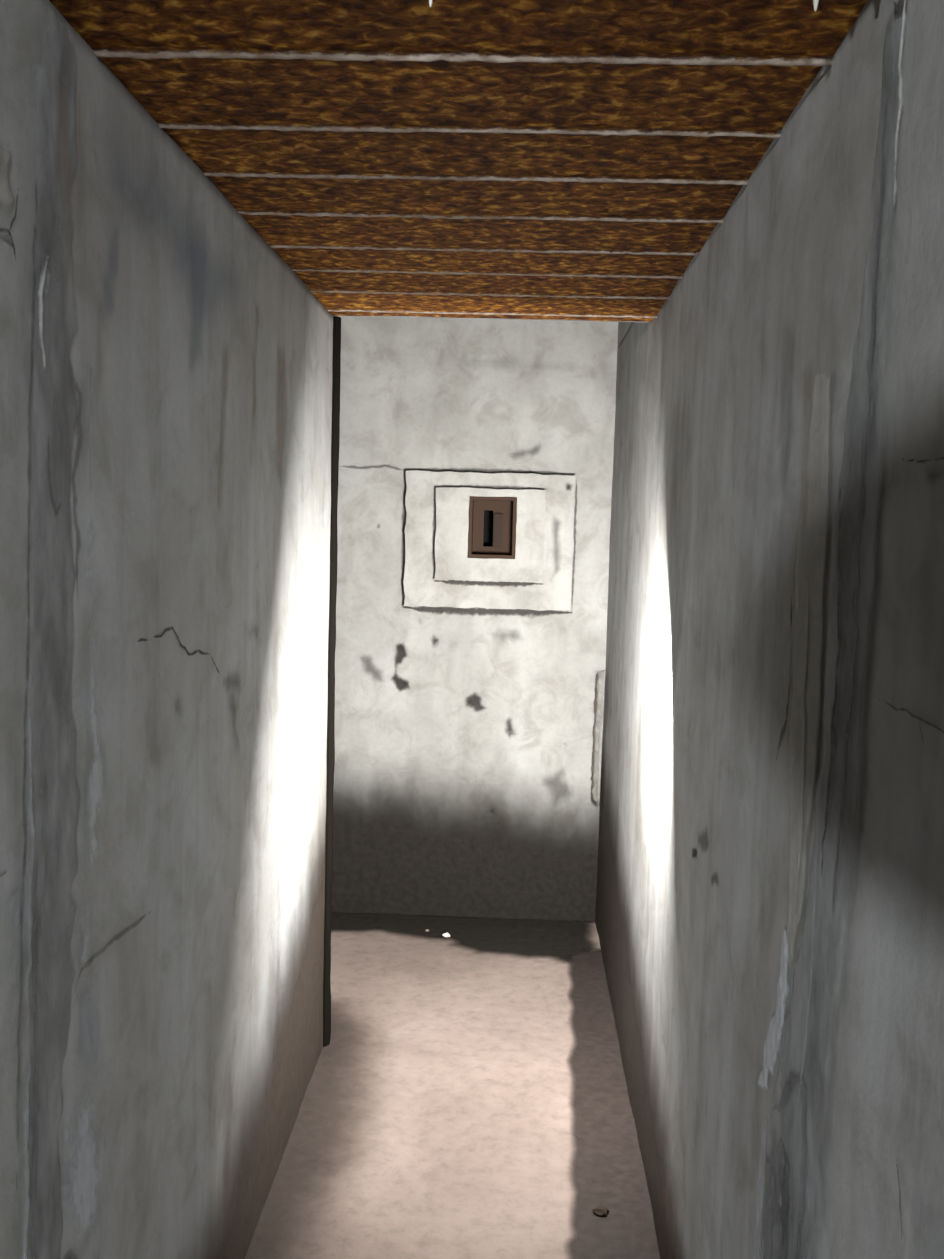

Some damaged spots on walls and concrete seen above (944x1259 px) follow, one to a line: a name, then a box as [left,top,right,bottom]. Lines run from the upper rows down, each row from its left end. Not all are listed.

crack [138,627,219,673]